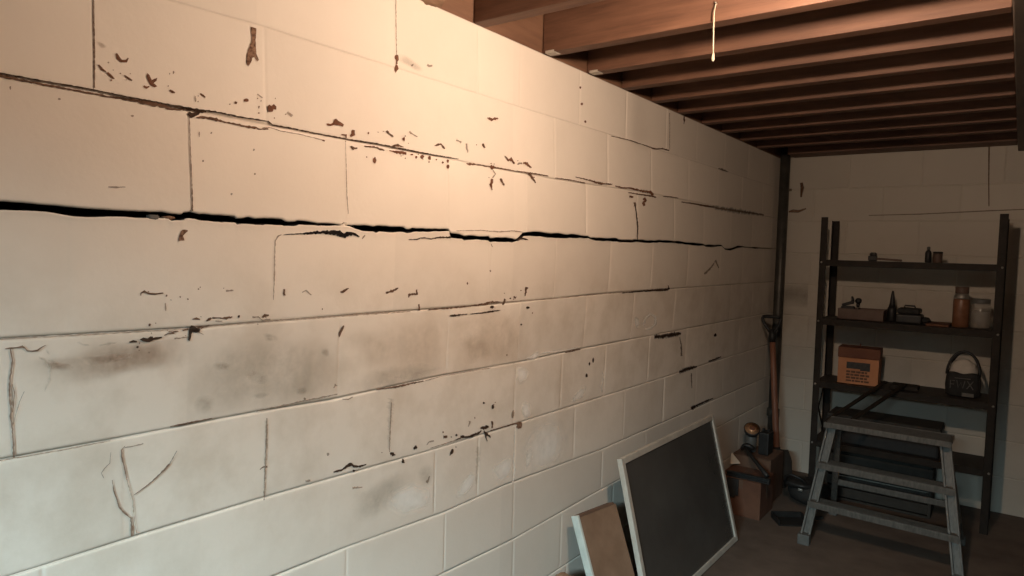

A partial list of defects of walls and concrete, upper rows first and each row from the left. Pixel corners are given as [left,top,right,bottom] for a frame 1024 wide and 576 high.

crack [0,0,764,536]